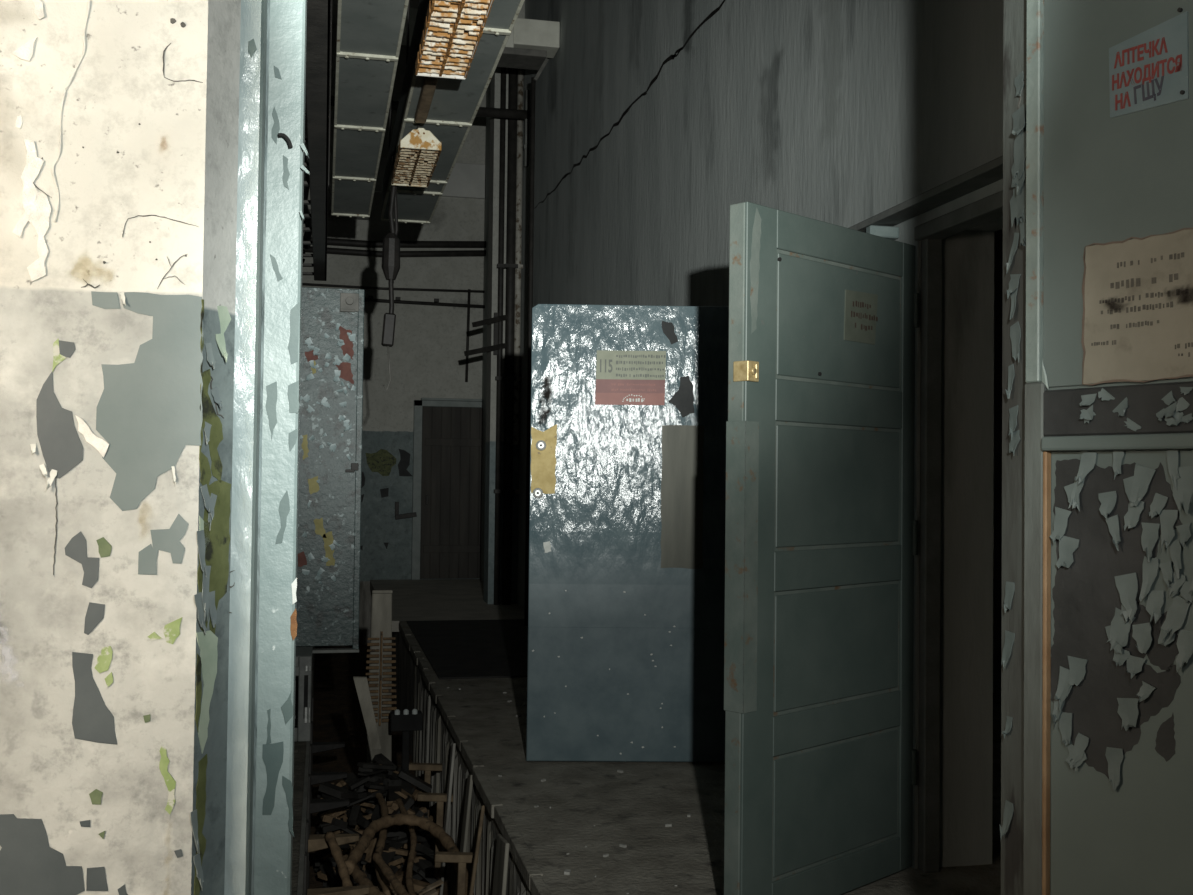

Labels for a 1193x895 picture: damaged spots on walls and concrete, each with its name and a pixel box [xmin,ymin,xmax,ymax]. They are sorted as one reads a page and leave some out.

crack [163,43,203,83]
crack [534,0,725,209]
crack [122,215,198,237]
crack [157,254,187,289]
peeling [1080,388,1141,431]
peeling [1156,387,1193,426]
peeling [30,291,231,895]
peeling [1050,449,1193,792]
peeling [0,814,128,895]